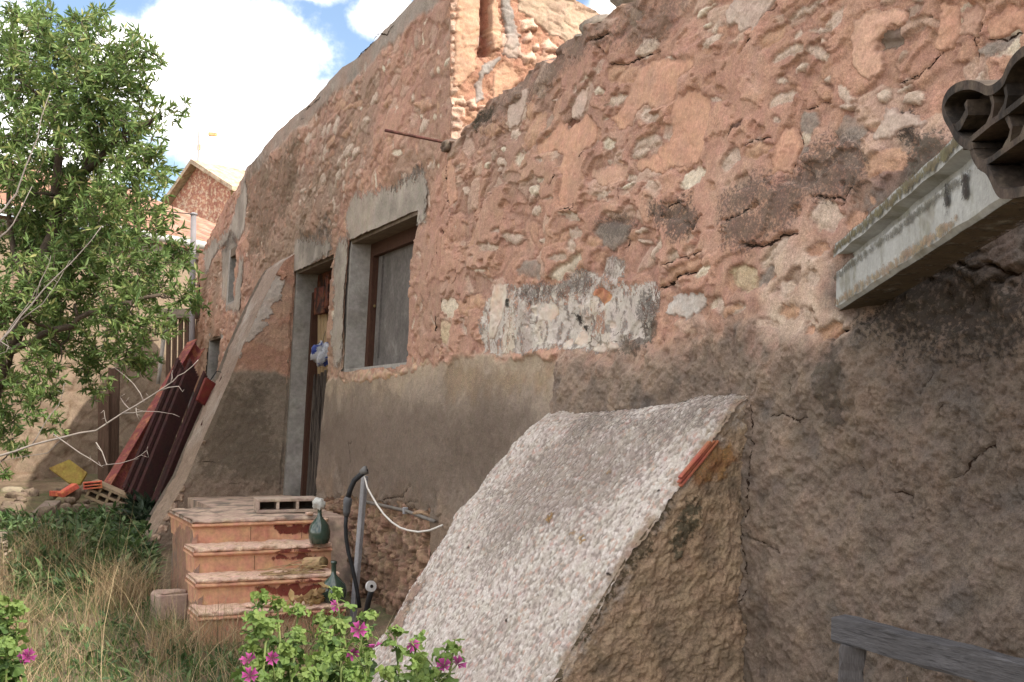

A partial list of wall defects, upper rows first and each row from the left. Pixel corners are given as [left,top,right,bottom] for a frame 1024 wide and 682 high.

crack [745,233,799,248]
peeling [478,256,707,358]
crack [738,379,808,630]
crack [955,444,996,478]